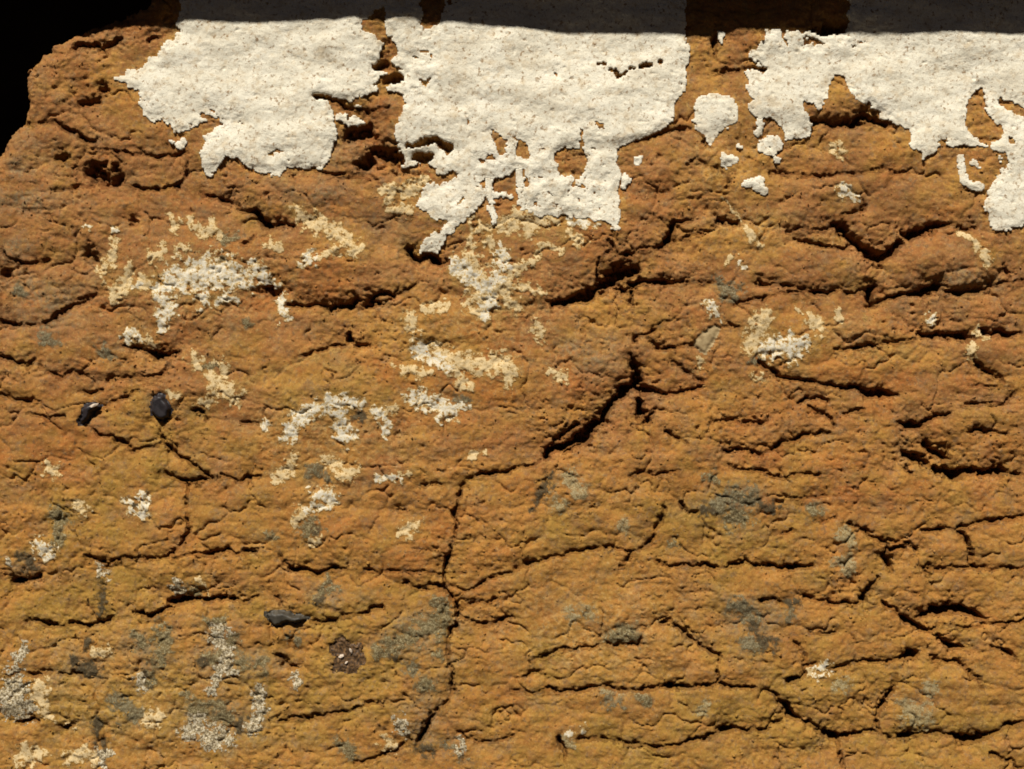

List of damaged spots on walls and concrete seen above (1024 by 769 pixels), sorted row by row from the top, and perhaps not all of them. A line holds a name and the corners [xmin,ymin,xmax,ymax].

crack [27,118,297,247]
peeling [169,137,187,150]
peeling [335,104,365,128]
peeling [377,170,432,220]
peeling [741,176,768,196]
peeling [957,154,985,192]
peeling [296,206,366,269]
crack [548,216,740,309]
crack [714,204,1024,329]
crack [0,292,99,329]
crack [283,243,451,358]
crack [0,327,1024,769]